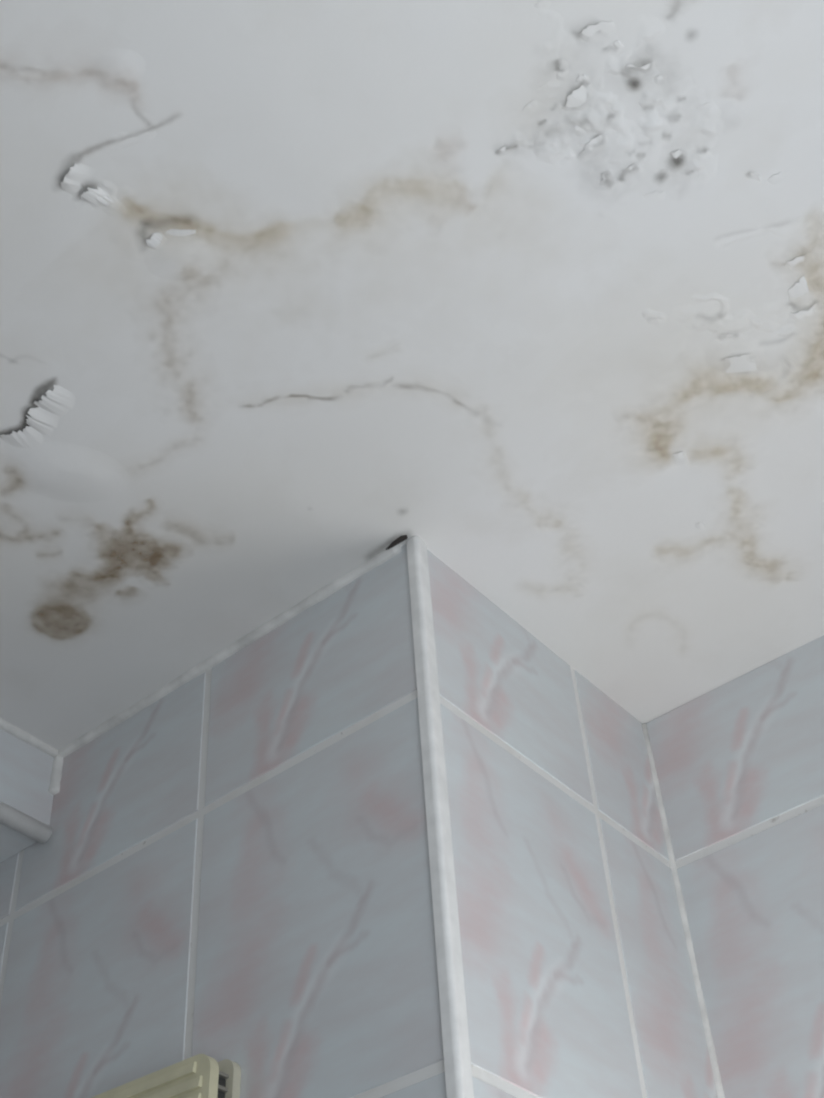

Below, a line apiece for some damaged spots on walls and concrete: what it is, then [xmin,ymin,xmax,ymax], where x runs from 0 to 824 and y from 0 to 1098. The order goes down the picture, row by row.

crack [87,127,157,157]
peeling [0,382,76,448]
water stain [100,521,164,578]